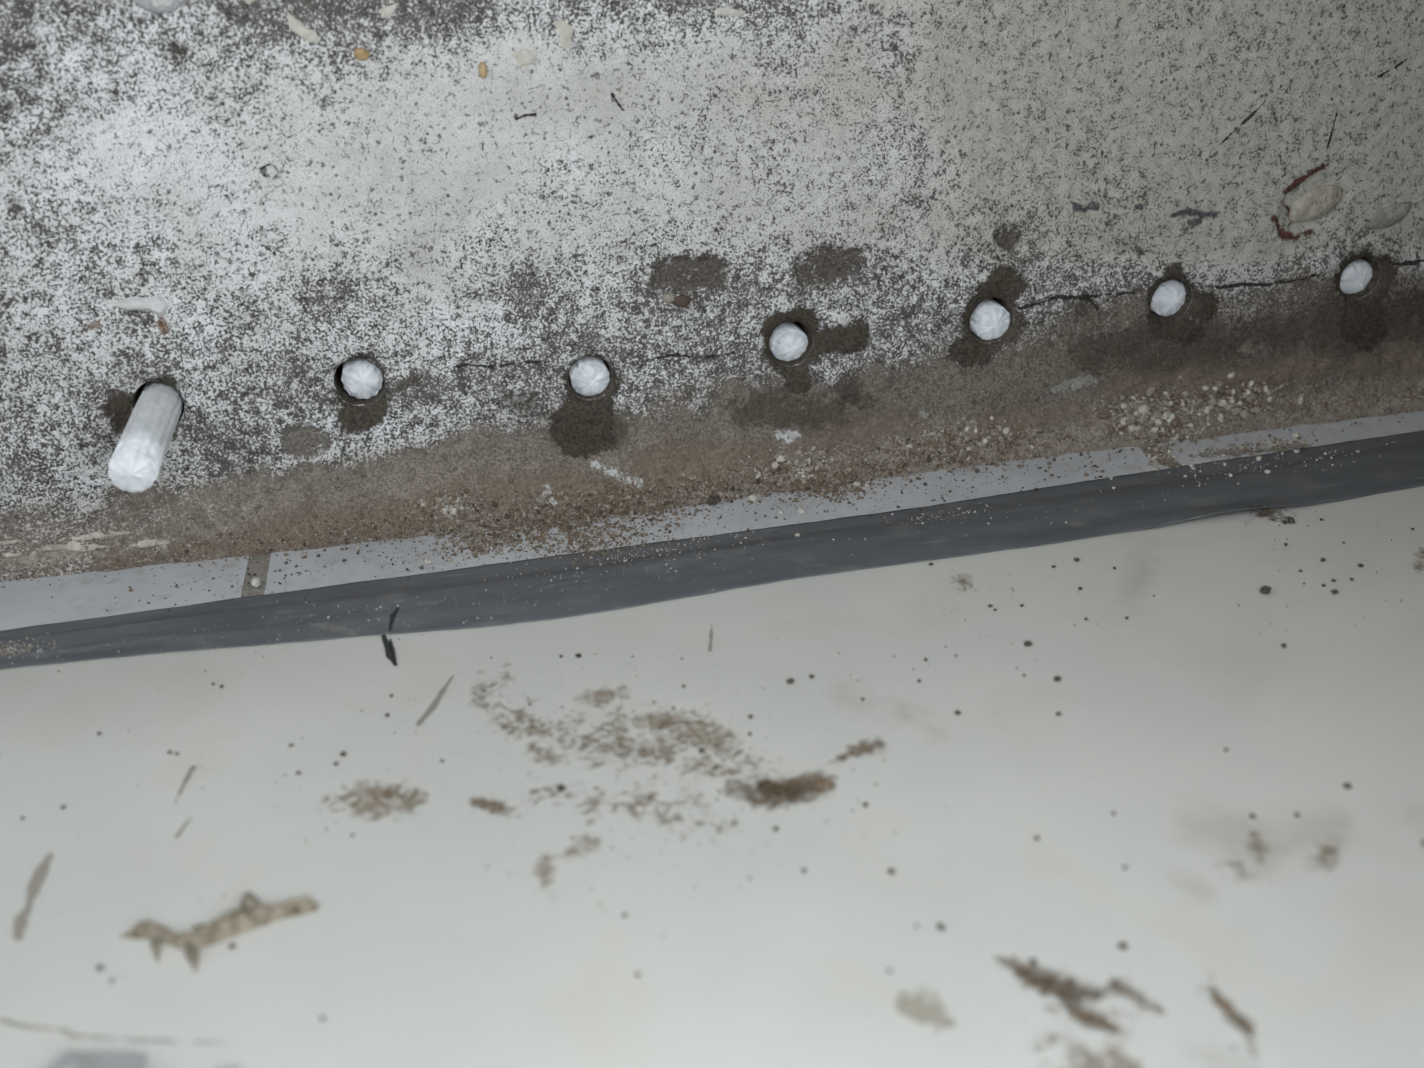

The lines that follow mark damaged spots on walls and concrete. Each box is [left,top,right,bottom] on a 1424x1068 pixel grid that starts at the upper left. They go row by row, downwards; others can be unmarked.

damp [948,265,1028,367]
crack [1019,291,1135,315]
damp [984,249,1424,431]
crack [1194,274,1321,289]
crack [1395,258,1424,266]
damp [483,307,932,511]
damp [99,482,468,568]